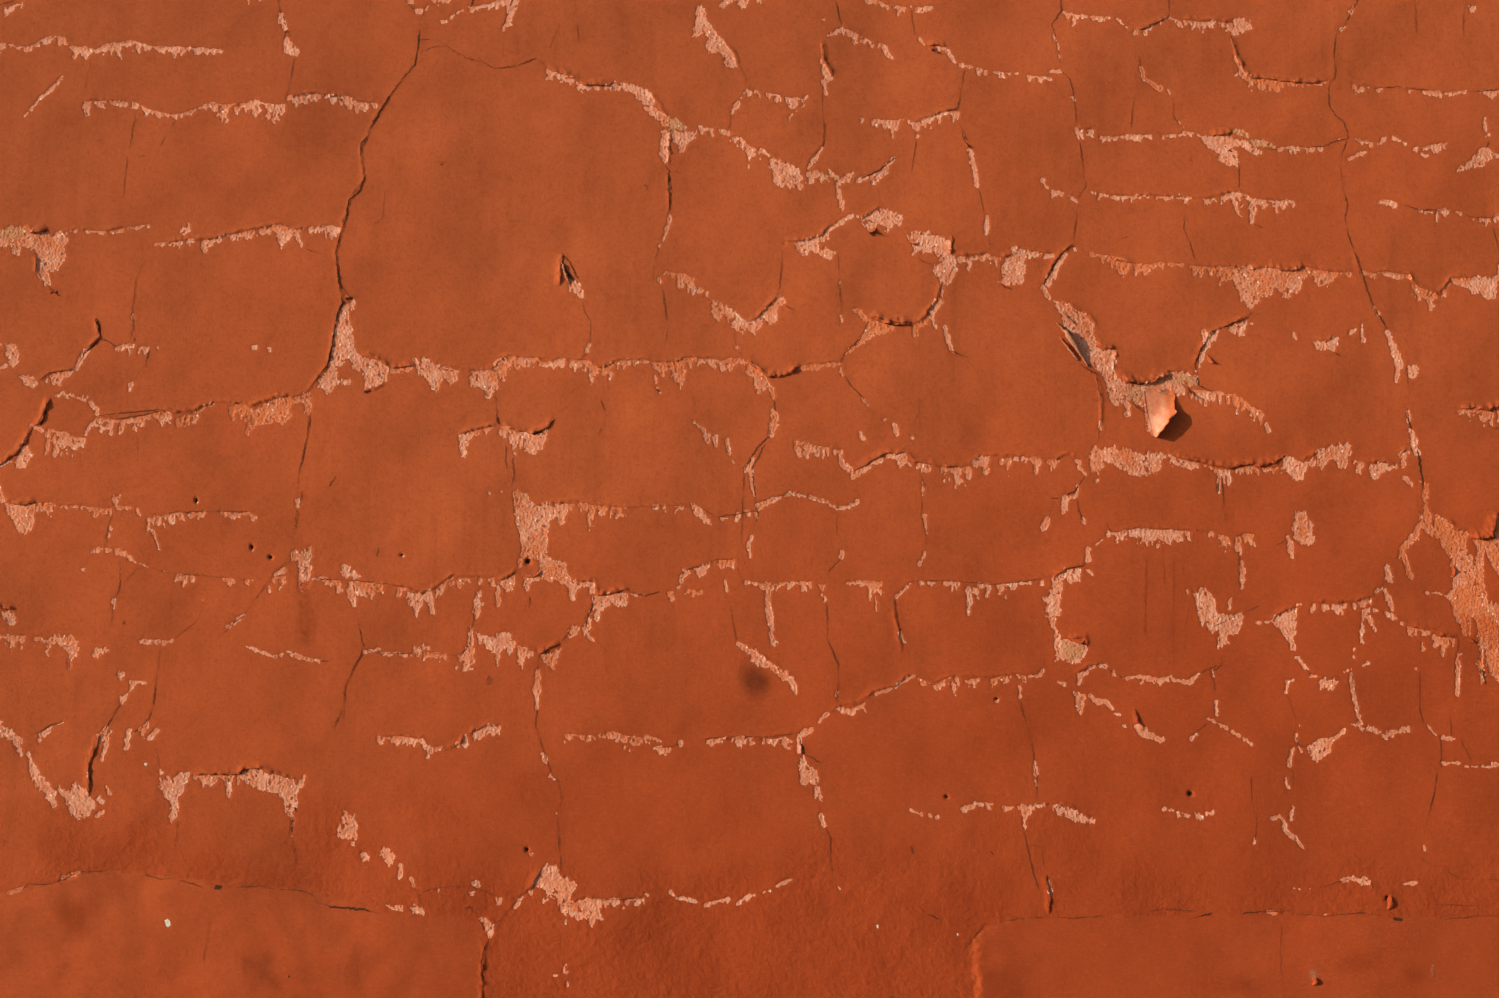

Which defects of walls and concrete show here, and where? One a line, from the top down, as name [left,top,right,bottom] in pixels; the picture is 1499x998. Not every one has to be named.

crack [290,0,519,548]
peeling [0,0,1062,469]
crack [1041,0,1086,300]
crack [1328,0,1421,456]
crack [740,423,772,561]
crack [859,409,920,441]
crack [1040,476,1086,532]
peeling [846,11,1499,849]
crack [139,599,245,721]
peeling [0,417,1096,928]
crack [928,737,1499,948]
crack [1189,717,1253,746]